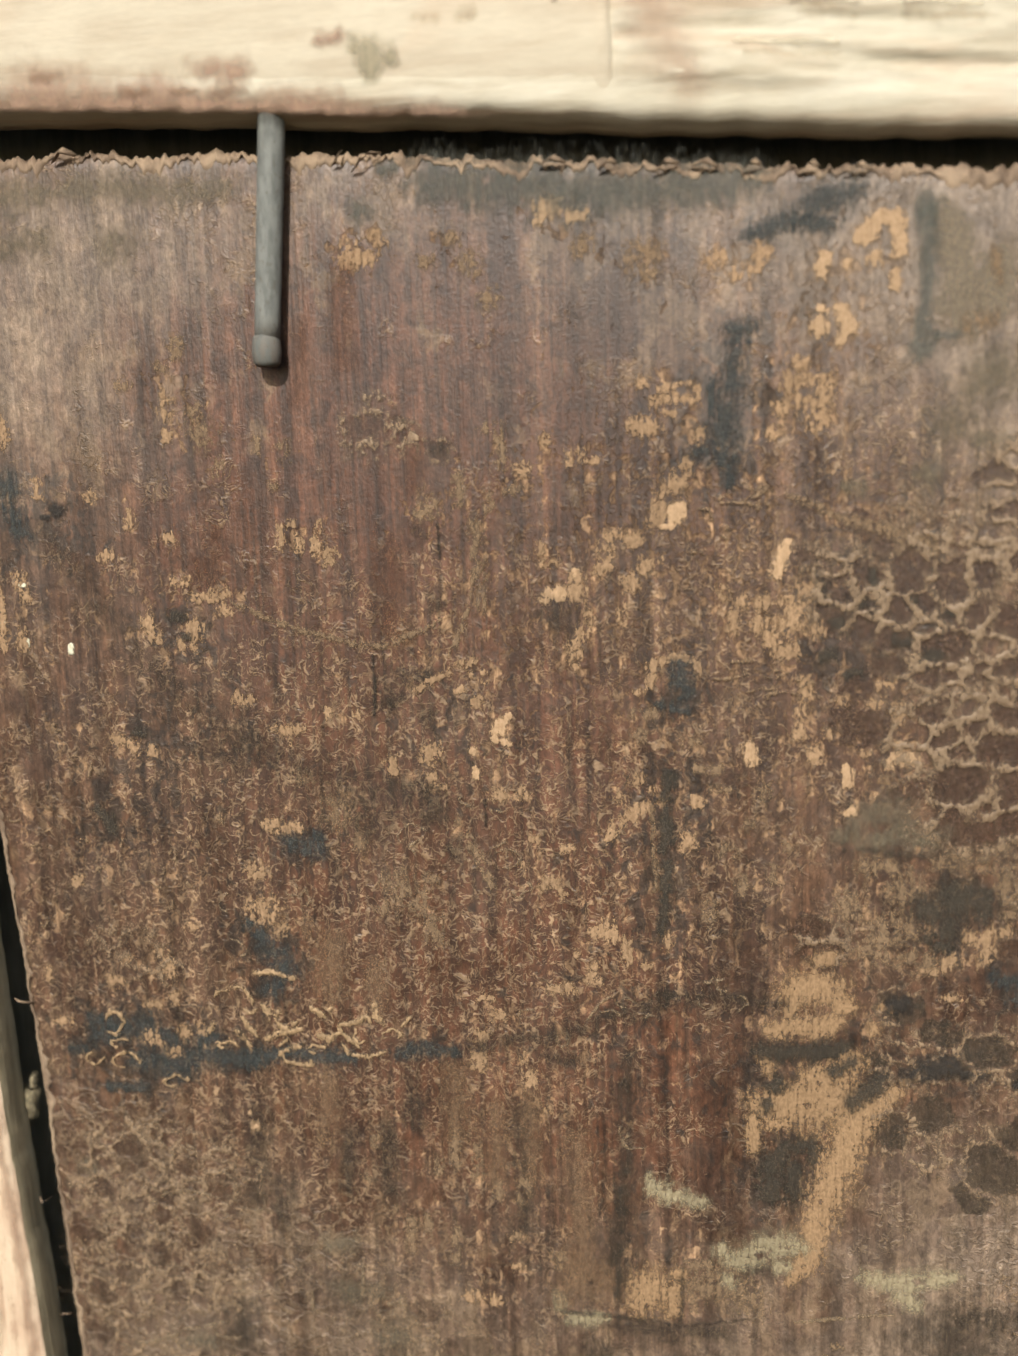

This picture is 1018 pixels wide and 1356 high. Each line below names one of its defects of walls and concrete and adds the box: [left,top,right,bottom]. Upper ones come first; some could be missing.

peeling [530,192,590,228]
peeling [700,239,776,284]
leakage [738,173,870,243]
peeling [812,205,910,294]
peeling [624,373,702,442]
leakage [690,315,762,489]
peeling [763,301,861,442]
peeling [534,423,709,673]
peeling [739,851,1018,1155]
leakage [68,1007,358,1191]